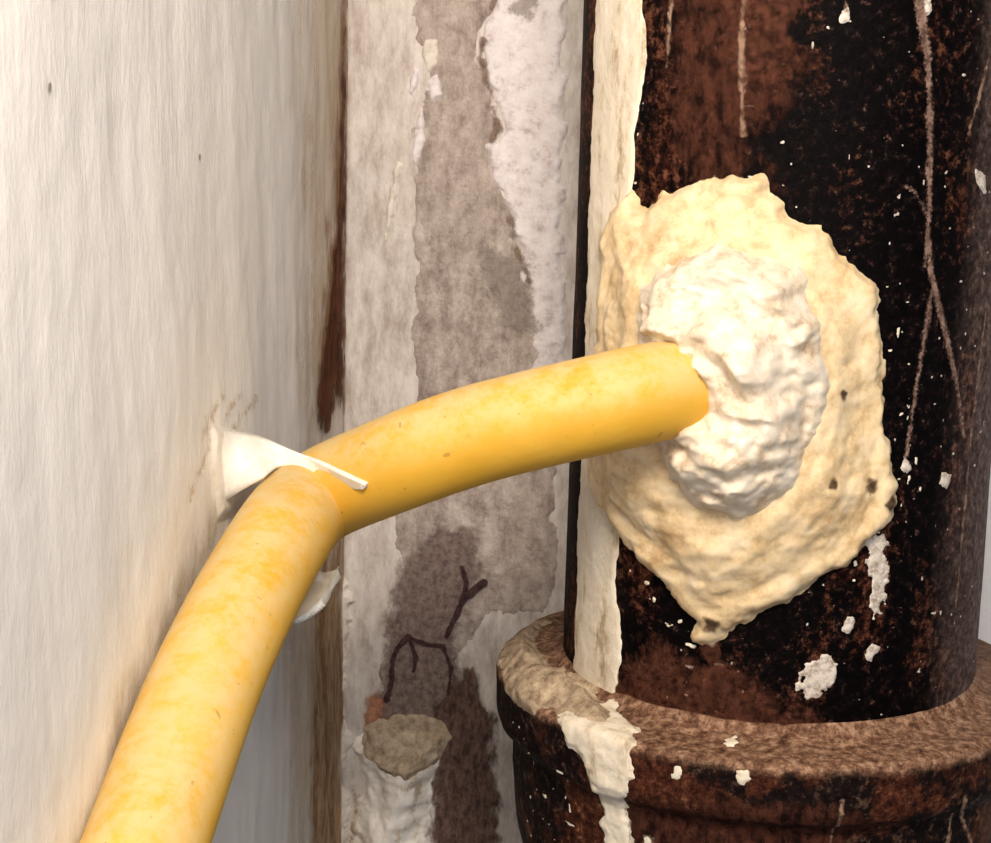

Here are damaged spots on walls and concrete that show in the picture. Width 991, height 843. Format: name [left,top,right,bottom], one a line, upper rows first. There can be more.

corrosion [661,0,811,181]
leakage [307,0,342,402]
peeling [384,0,569,402]
leakage [291,614,331,843]
peeling [340,708,356,843]
peeling [341,575,356,694]
spalling [364,657,390,725]
peeling [395,466,558,661]
corrosion [615,635,818,725]
corrosion [624,794,861,843]